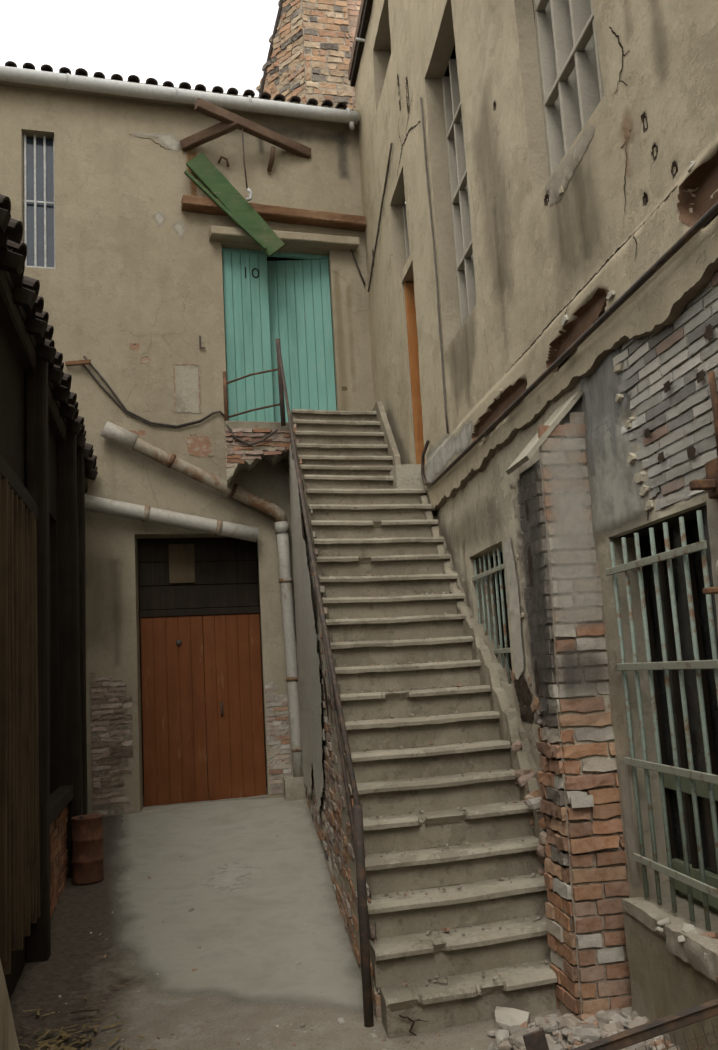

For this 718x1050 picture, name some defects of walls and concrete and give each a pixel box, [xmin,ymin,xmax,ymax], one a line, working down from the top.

crack [609,26,630,95]
peeling [613,267,718,512]
flaking render [264,444,329,815]